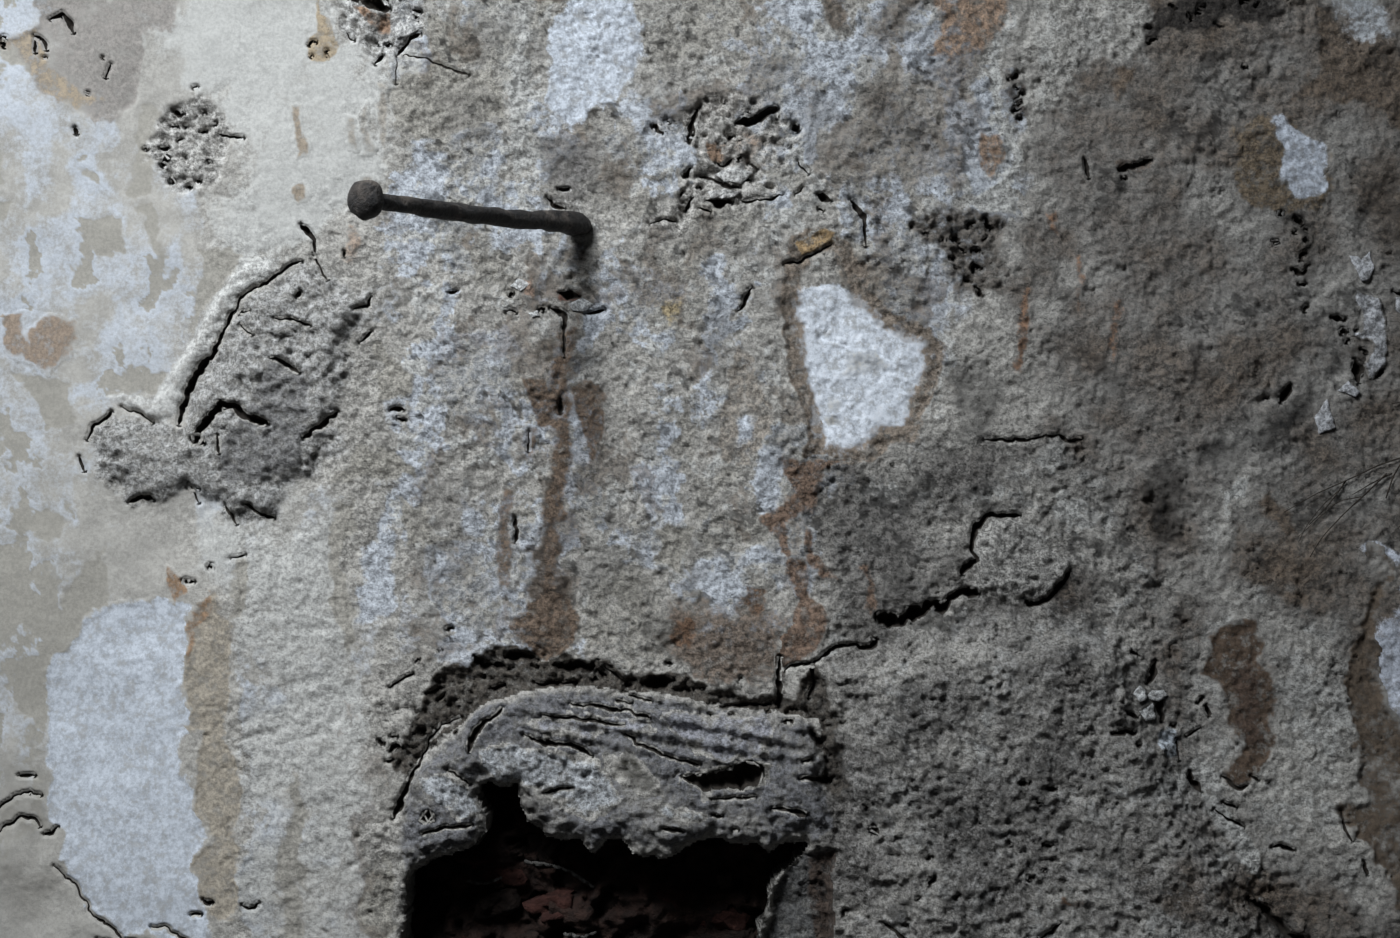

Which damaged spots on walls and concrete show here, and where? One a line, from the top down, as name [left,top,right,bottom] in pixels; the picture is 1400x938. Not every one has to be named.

flaking render [0,0,243,202]
flaking render [306,0,430,66]
water stain [1137,0,1295,58]
corrosion [334,216,366,268]
flaking render [639,80,950,473]
corrosion [492,305,612,662]
crack [784,509,1020,673]
crack [1024,570,1073,610]
flaking render [41,563,248,938]
flaking render [377,640,853,804]
water stain [1331,542,1400,913]
crack [0,772,260,938]